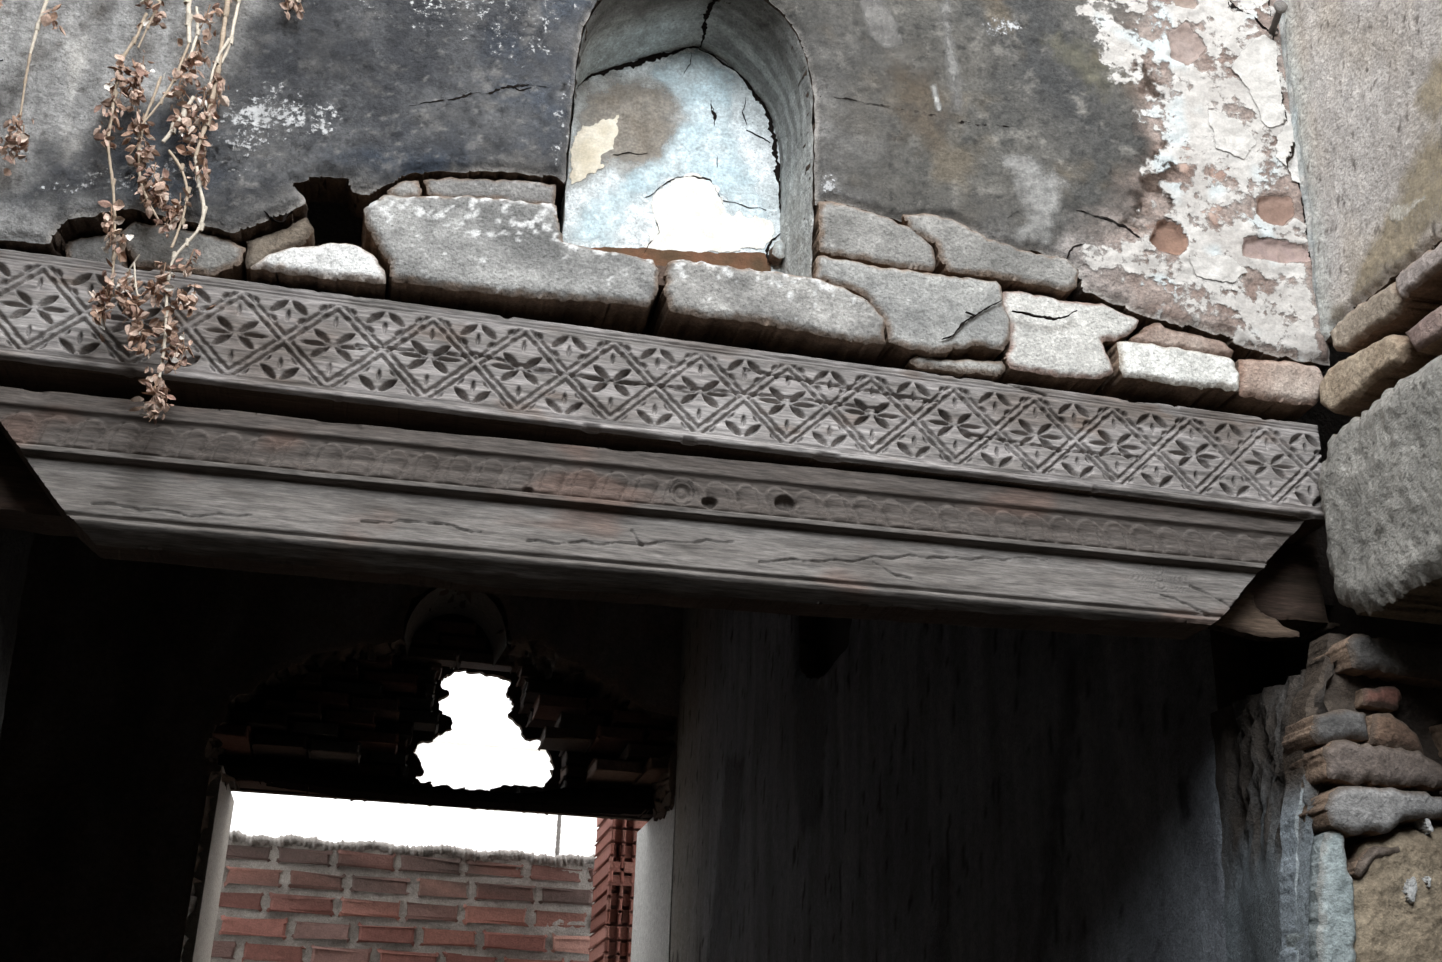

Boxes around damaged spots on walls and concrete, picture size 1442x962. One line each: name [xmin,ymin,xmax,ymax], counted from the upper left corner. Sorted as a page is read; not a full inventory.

water stain [410,0,559,58]
peeling [569,114,619,184]
crack [409,0,781,264]
crack [820,96,1008,127]
crack [1228,0,1314,270]
peeling [591,172,785,272]
peeling [1075,0,1442,625]